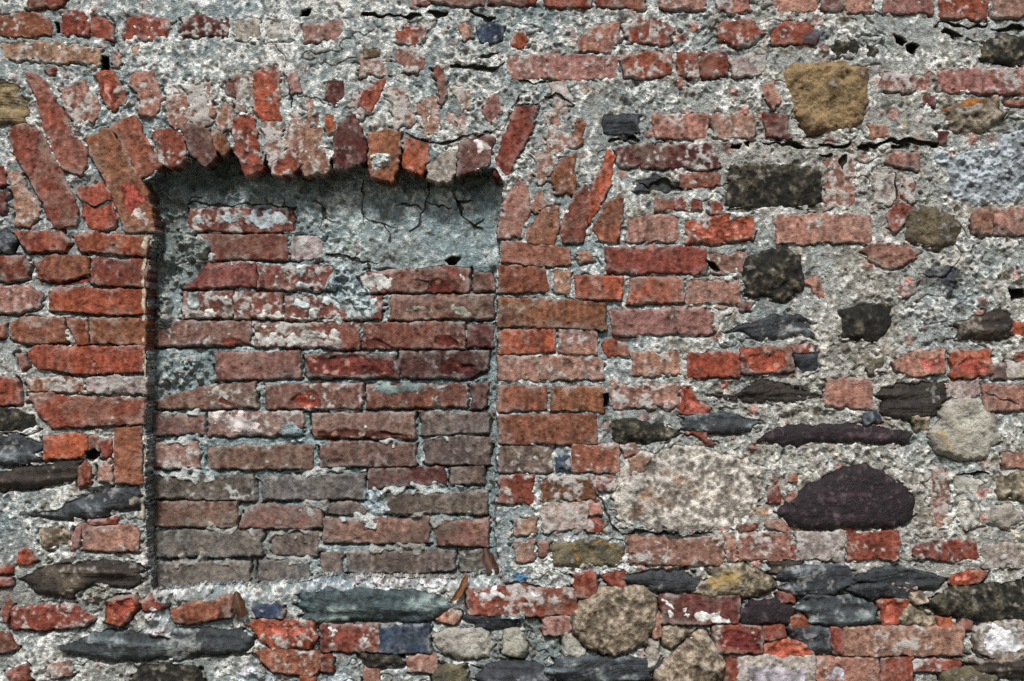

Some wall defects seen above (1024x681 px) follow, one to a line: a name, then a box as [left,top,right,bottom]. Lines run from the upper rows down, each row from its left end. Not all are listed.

crack [762,137,939,205]
crack [326,180,485,272]